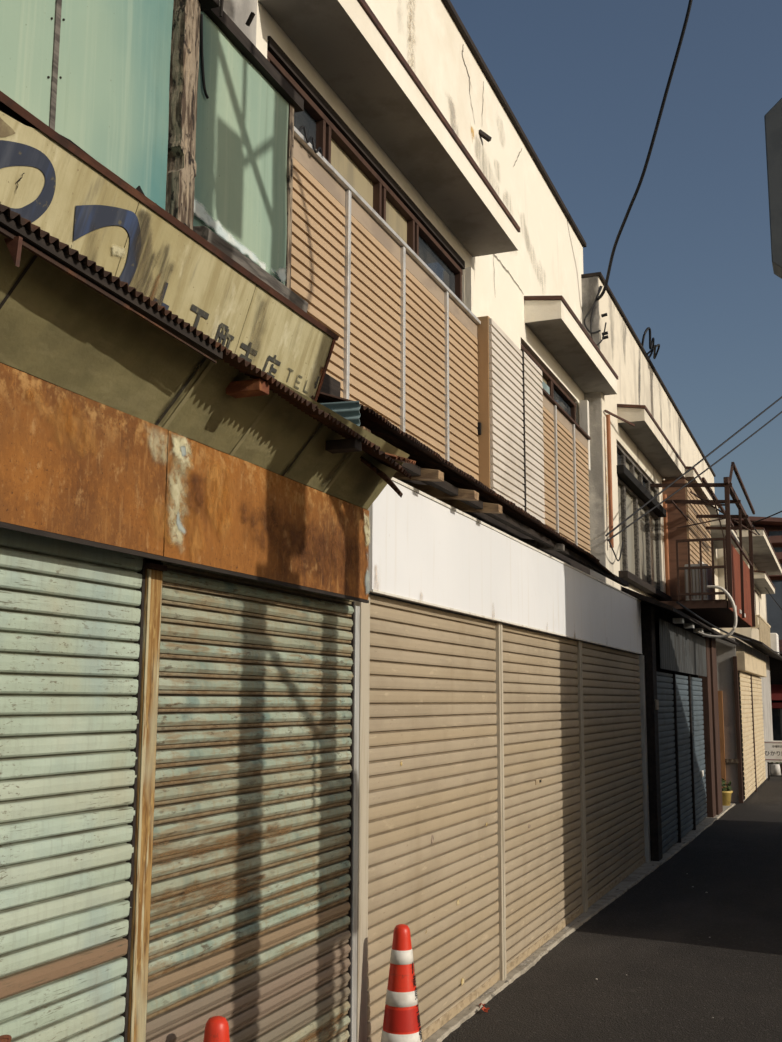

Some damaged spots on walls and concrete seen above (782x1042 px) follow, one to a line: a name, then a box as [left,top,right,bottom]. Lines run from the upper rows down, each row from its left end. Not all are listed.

crack [462,44,484,122]
peeling [168,435,193,543]
corrosion [187,465,357,573]